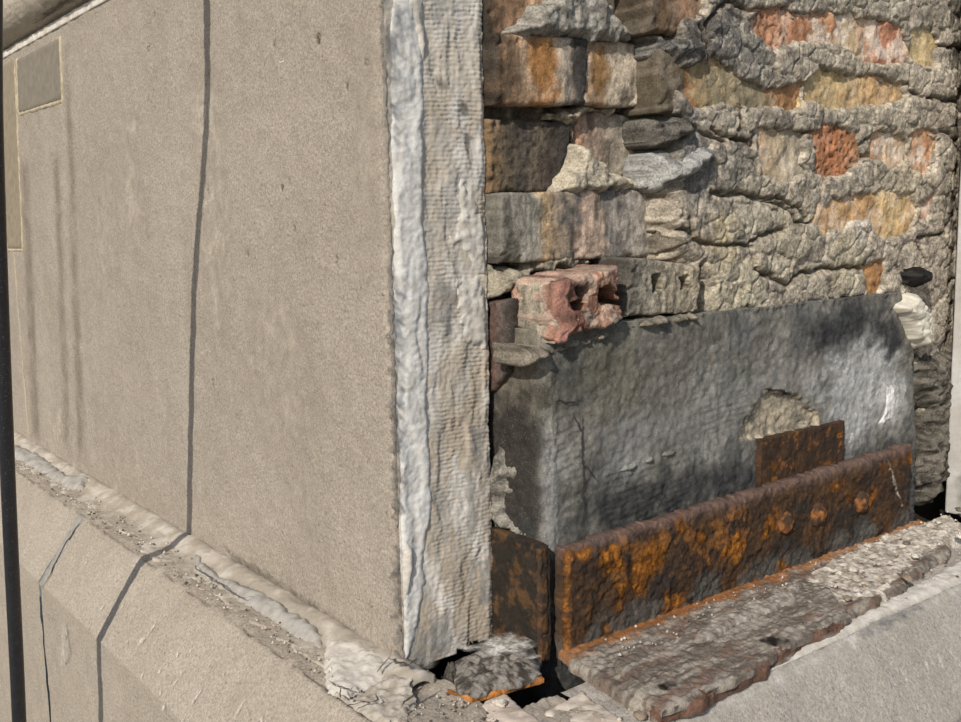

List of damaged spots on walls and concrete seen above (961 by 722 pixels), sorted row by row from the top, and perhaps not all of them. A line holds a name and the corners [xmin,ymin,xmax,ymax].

spalling [510,257,700,344]
spalling [738,390,820,440]
leakage [804,338,908,443]
peeling [865,385,896,424]
crack [555,400,599,527]
rust [722,532,746,563]
rust [536,548,549,662]
rust [561,544,787,650]
spalling [334,674,417,722]
rust [447,676,544,703]
rust [613,581,852,722]